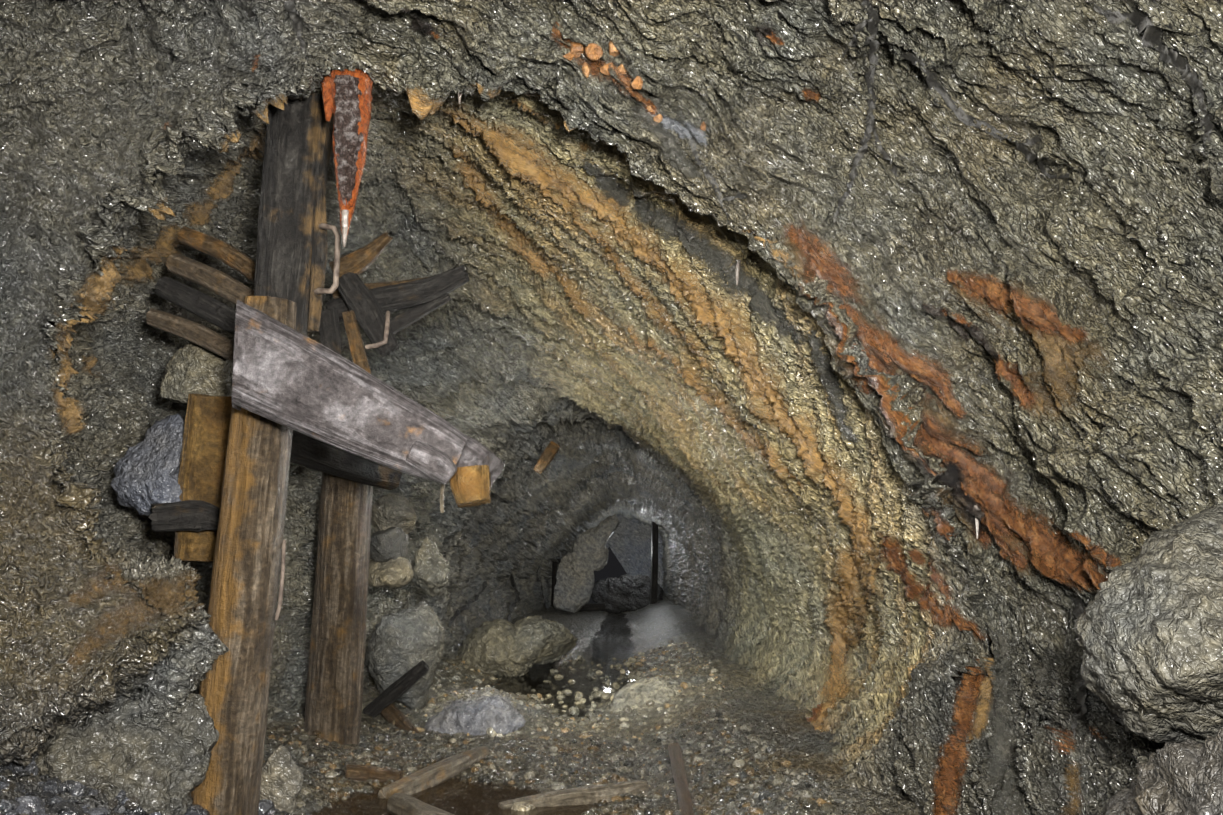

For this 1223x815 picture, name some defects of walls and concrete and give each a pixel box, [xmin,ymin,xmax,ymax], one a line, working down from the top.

corrosion [476,83,573,132]
corrosion [408,91,995,815]
corrosion [743,224,1122,592]